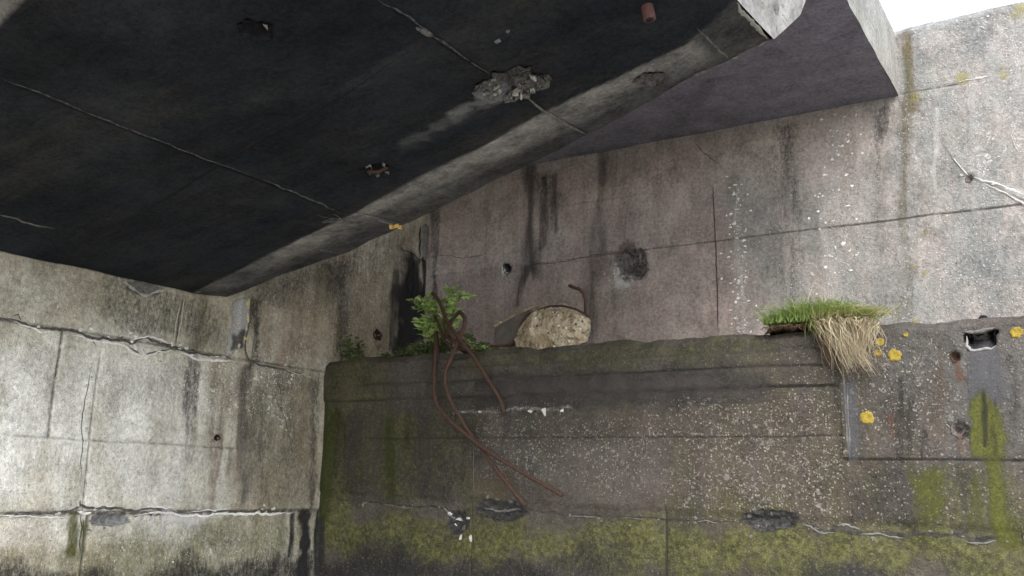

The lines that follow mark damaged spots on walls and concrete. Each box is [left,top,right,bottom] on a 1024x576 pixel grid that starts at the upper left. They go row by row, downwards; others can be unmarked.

spalling [440,65,552,129]
crack [0,80,619,269]
crack [942,144,1024,205]
leakage [516,164,557,305]
spalling [603,239,650,294]
leakage [389,253,426,354]
crack [0,299,315,552]
spalling [85,511,137,531]
spalling [448,495,528,542]
spalling [739,508,799,538]
crack [791,514,1024,545]